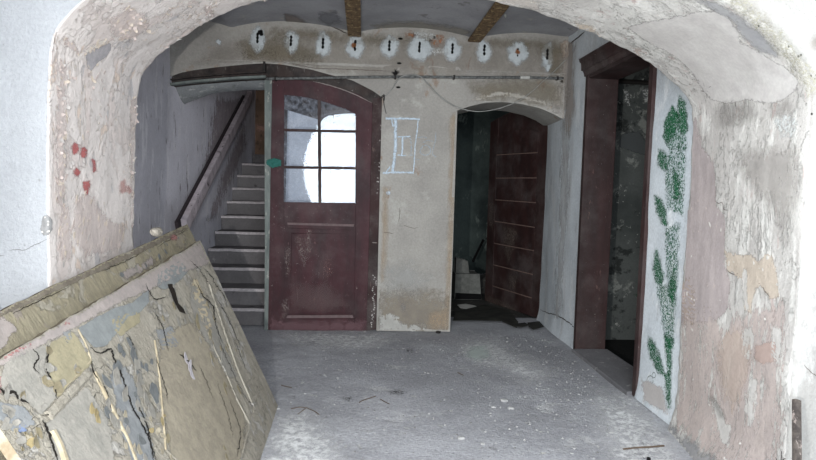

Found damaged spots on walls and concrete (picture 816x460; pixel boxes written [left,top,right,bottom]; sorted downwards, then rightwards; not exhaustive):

peeling [40,5,151,268]
peeling [697,0,777,56]
damp [379,291,449,330]
peeling [676,117,786,460]